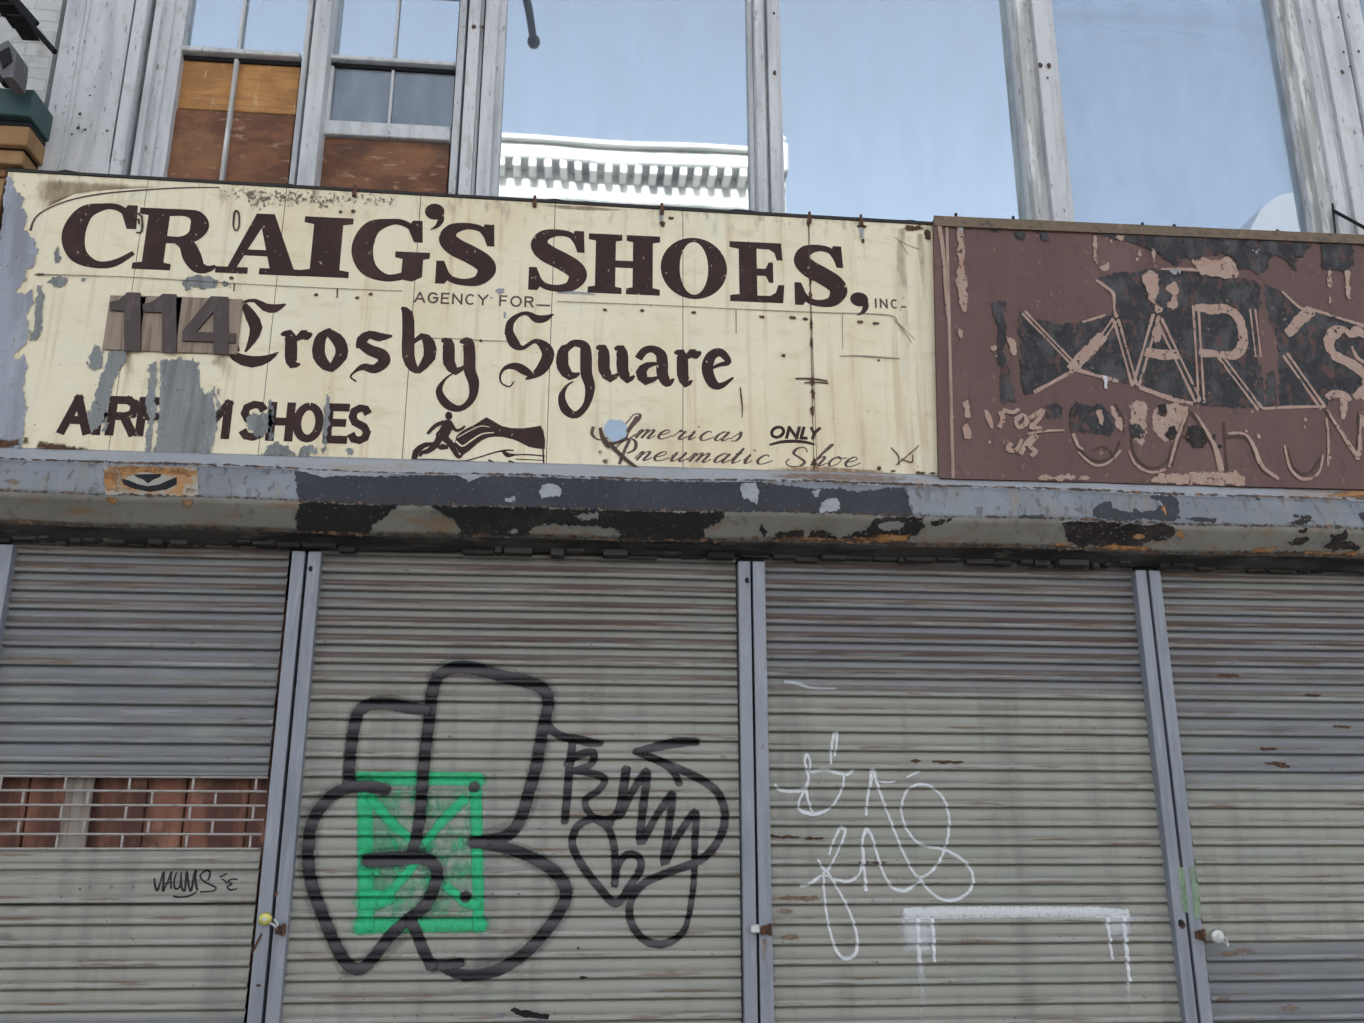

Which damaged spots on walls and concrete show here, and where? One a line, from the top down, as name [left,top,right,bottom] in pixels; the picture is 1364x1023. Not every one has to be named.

peeling [0,176,86,450]
peeling [182,275,231,291]
peeling [937,226,969,317]
peeling [1092,234,1364,343]
peeling [86,345,127,433]
peeling [145,356,222,454]
peeling [962,301,1222,457]
peeling [1327,398,1364,430]
peeling [246,394,952,543]
corrosion [789,534,908,544]
corrosion [1103,534,1149,551]